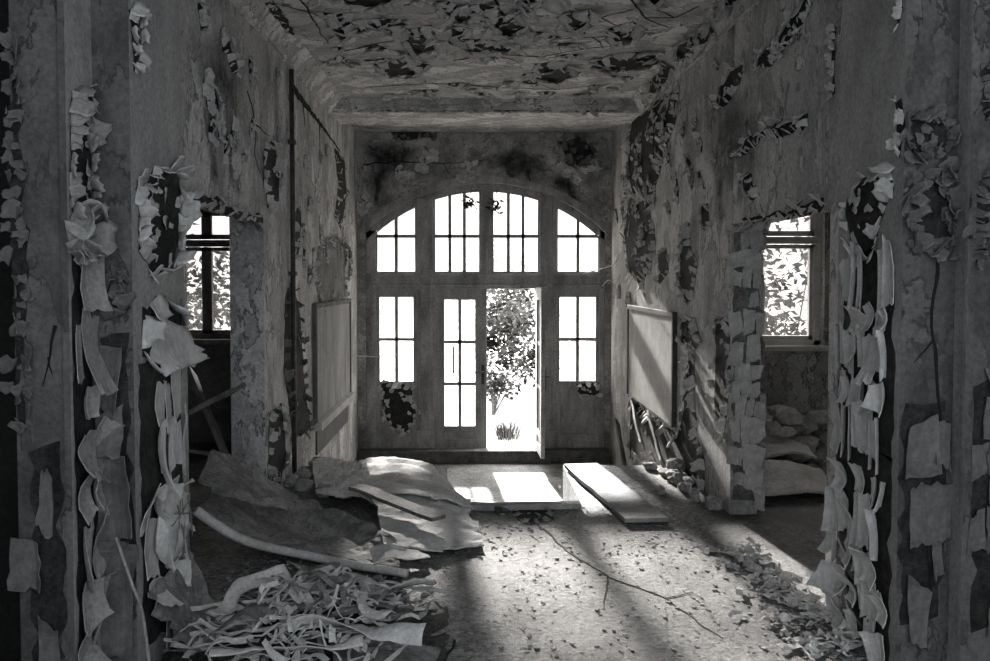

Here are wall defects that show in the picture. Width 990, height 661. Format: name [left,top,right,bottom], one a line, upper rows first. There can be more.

peeling [0,27,36,436]
peeling [128,1,153,74]
peeling [6,84,288,661]
peeling [197,0,260,87]
peeling [202,68,261,165]
peeling [263,0,305,39]
flaking render [267,144,354,486]
peeling [312,0,990,661]